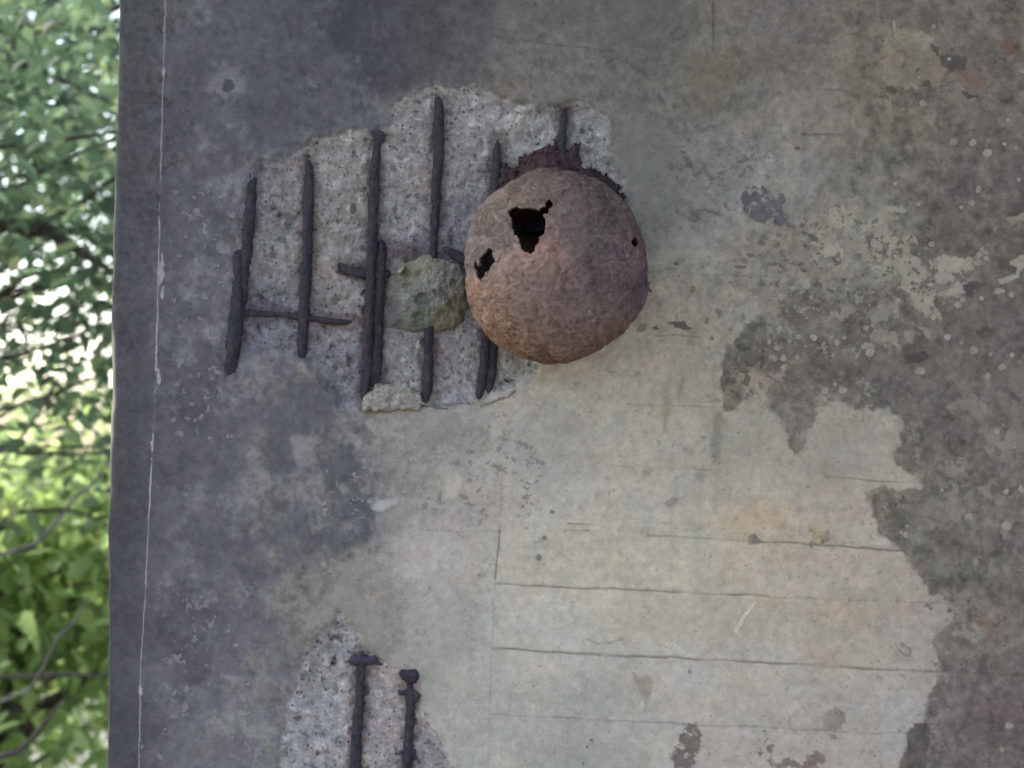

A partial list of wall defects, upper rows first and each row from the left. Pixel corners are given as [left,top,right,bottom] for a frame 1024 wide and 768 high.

corrosion [371,130,387,145]
corrosion [399,224,465,269]
water stain [777,195,989,351]
water stain [997,255,1024,285]
spalling [218,84,623,526]
corrosion [345,651,382,666]
spalling [272,614,460,768]
corrosion [398,669,420,703]